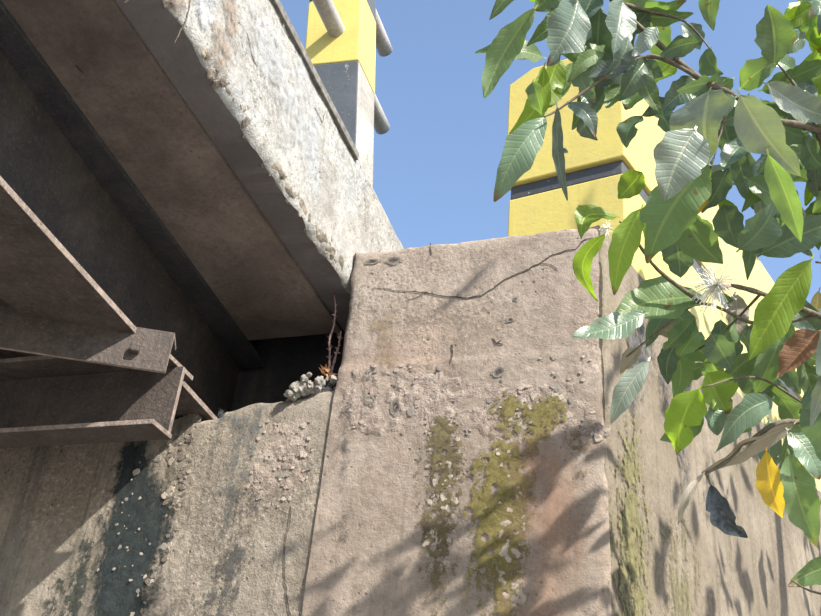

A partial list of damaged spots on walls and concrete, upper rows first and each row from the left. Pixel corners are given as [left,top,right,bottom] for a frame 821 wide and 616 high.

crack [175,0,191,42]
crack [371,238,592,300]
water stain [628,323,655,369]
water stain [44,441,176,616]
crack [283,506,291,616]
water stain [415,390,567,616]
water stain [607,374,703,616]